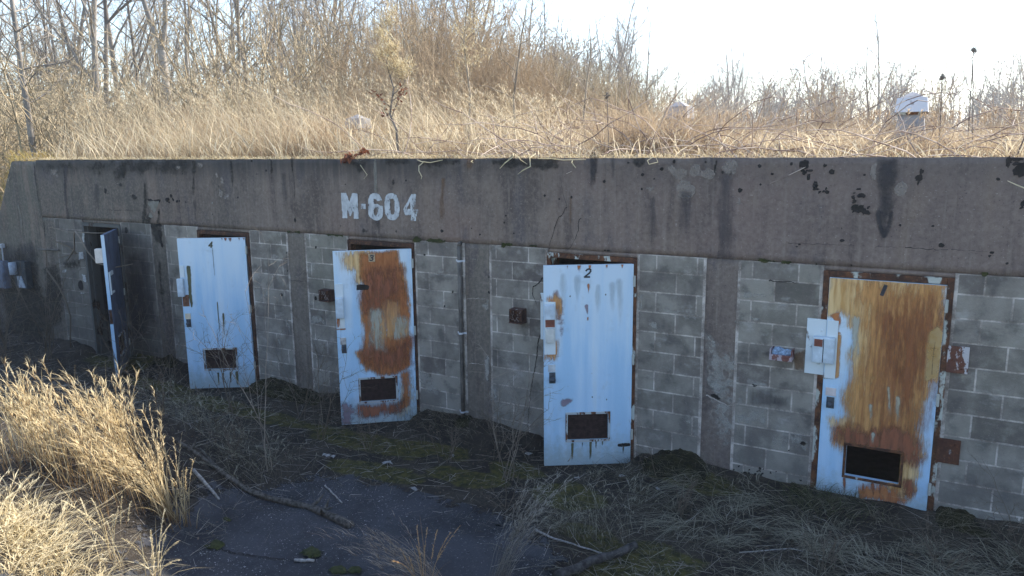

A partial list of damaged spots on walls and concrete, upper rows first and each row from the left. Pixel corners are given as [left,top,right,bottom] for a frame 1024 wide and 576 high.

leakage [876,161,896,237]
rust [343,250,414,418]
rust [547,294,562,316]
rust [823,278,947,504]